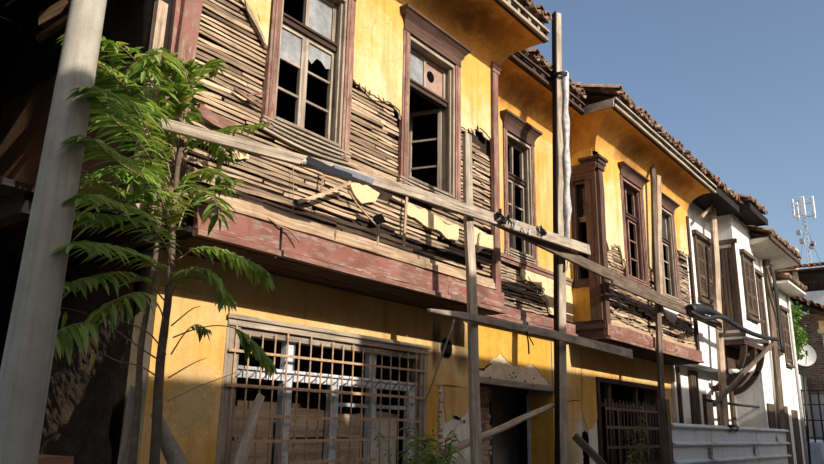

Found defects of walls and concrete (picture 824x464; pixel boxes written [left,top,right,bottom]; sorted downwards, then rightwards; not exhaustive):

flaking render [190,0,399,182]
flaking render [183,139,466,282]
flaking render [461,125,491,210]
flaking render [473,218,553,315]
flaking render [607,243,696,350]
spalling [479,355,549,385]
peeling [435,385,471,464]